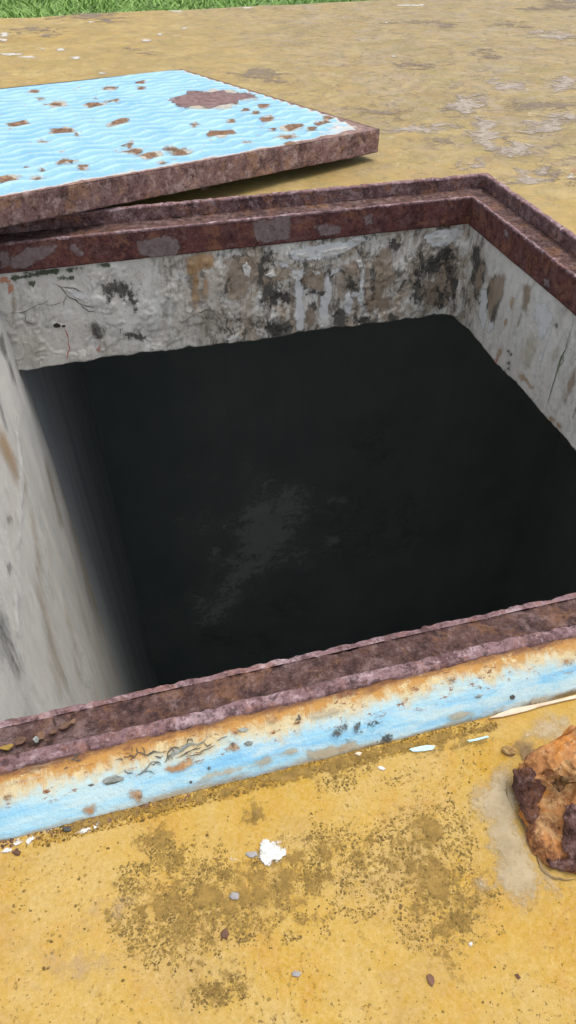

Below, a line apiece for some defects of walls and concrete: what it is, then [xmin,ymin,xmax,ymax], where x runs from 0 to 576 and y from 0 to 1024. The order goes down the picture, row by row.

corrosion [0,166,44,183]
corrosion [38,127,78,143]
corrosion [83,86,119,108]
corrosion [107,118,128,127]
corrosion [121,143,191,164]
corrosion [171,89,334,146]
water stain [96,263,175,342]
water stain [256,238,403,338]
water stain [411,244,505,333]
crack [544,318,575,414]
crack [116,735,227,777]
peeling [89,775,124,786]